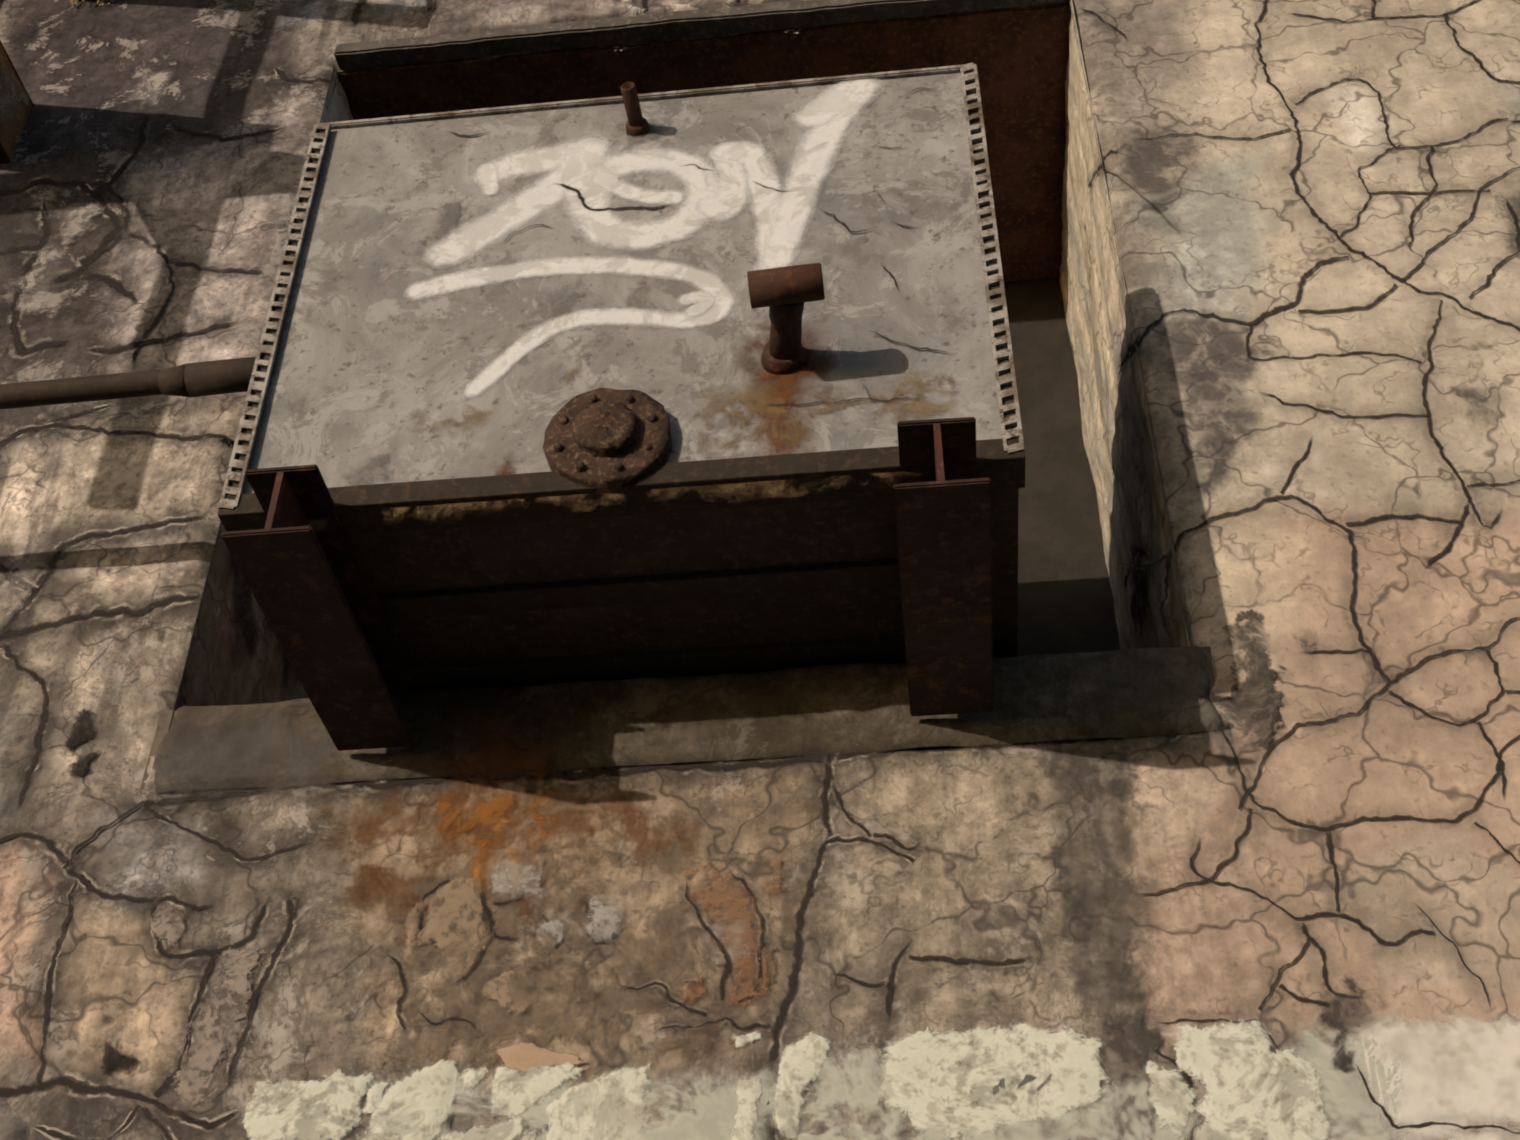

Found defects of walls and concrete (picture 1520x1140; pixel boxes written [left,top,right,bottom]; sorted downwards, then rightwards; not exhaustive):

crack [0,114,283,363]
crack [0,404,235,448]
rust [707,340,857,455]
crack [0,514,203,808]
crack [491,0,1520,1140]
spalling [151,902,186,946]
spalling [170,945,271,1106]
crack [0,776,468,1140]
crack [389,879,618,1030]
rust [354,716,692,923]
spalling [243,848,1520,1140]
spalling [1045,747,1136,941]